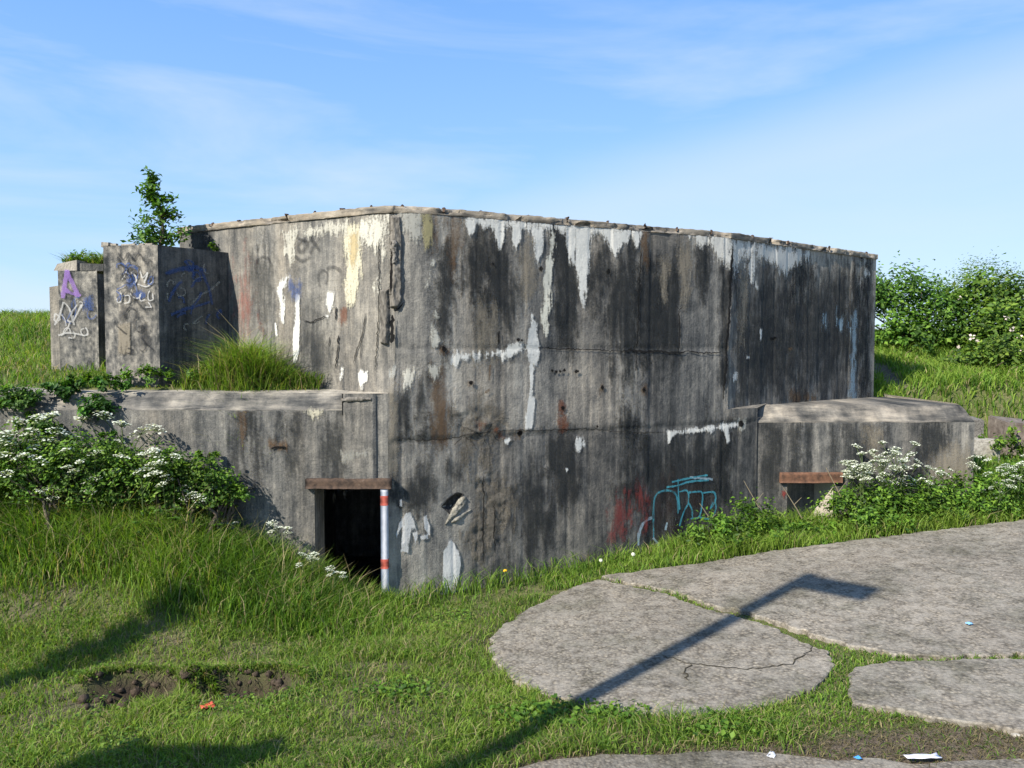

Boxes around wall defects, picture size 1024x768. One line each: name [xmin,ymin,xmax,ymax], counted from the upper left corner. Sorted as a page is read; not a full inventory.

crack [304,241,404,368]
water stain [282,213,683,444]
water stain [688,235,873,407]
water stain [389,464,435,520]
spalling [441,392,518,574]
water stain [508,423,585,562]
water stain [615,408,739,549]
water stain [762,423,812,486]
crack [663,646,813,681]